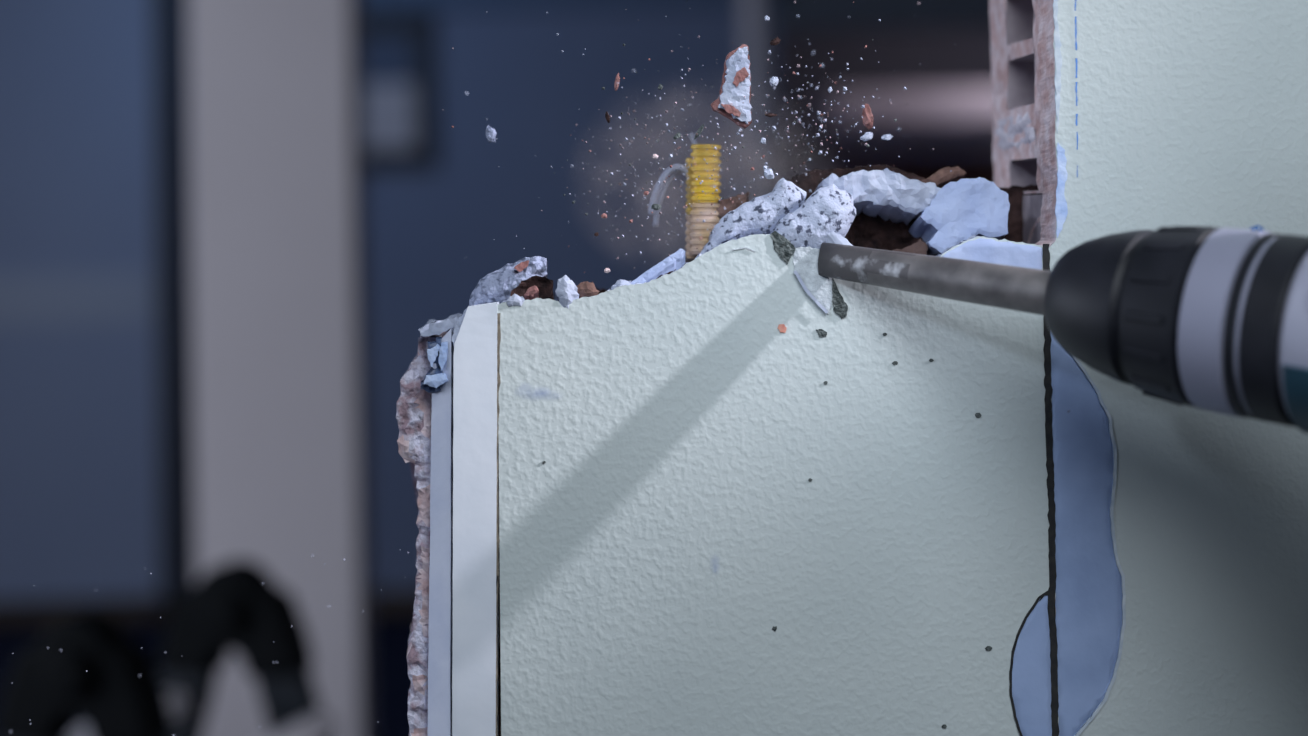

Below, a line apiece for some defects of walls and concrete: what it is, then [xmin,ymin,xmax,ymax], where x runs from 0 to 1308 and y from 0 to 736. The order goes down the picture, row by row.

spalling [770,231,848,337]
peeling [942,238,1043,270]
crack [1042,244,1050,271]
crack [1039,316,1059,736]